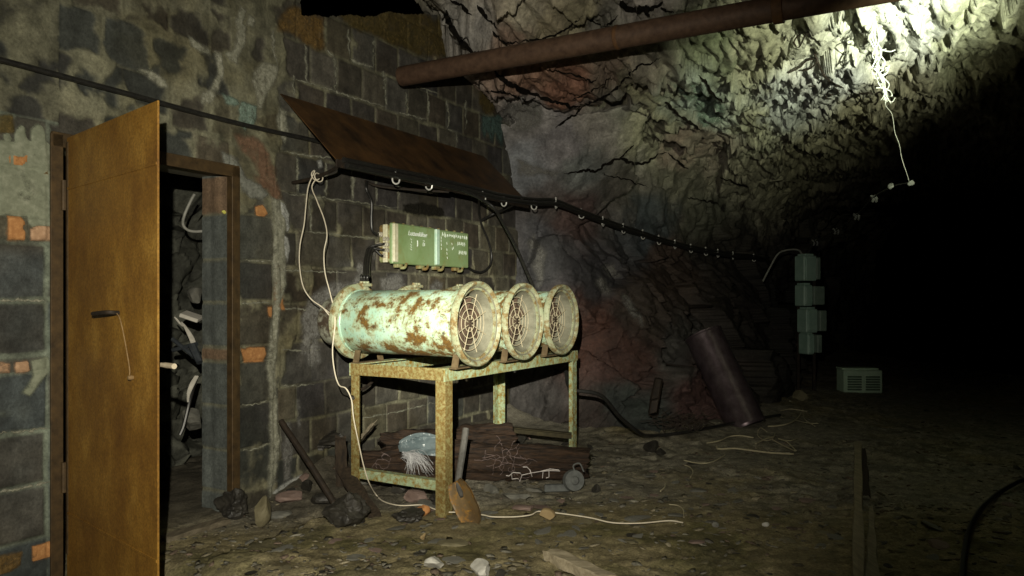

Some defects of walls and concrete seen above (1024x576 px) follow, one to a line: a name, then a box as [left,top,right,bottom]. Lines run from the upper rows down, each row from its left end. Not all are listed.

peeling [0,115,50,241]
crack [564,145,689,187]
spalling [0,361,30,373]